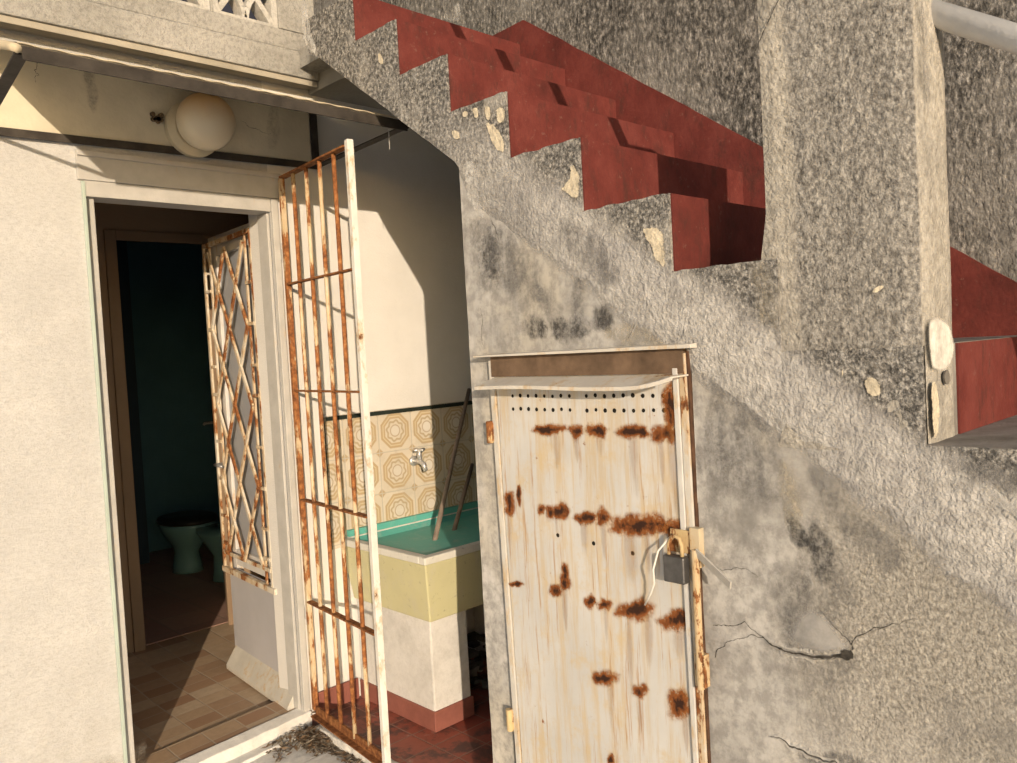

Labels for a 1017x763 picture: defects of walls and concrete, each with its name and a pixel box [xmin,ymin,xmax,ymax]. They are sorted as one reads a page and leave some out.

peeling [463,106,505,152]
peeling [562,165,580,198]
leakage [475,221,543,302]
peeling [643,227,665,266]
leakage [530,318,583,339]
leakage [595,307,633,336]
rust [533,351,699,527]
rust [537,502,681,537]
rust [584,594,686,632]
crack [713,609,912,665]
rust [668,689,690,719]
crack [769,733,842,763]